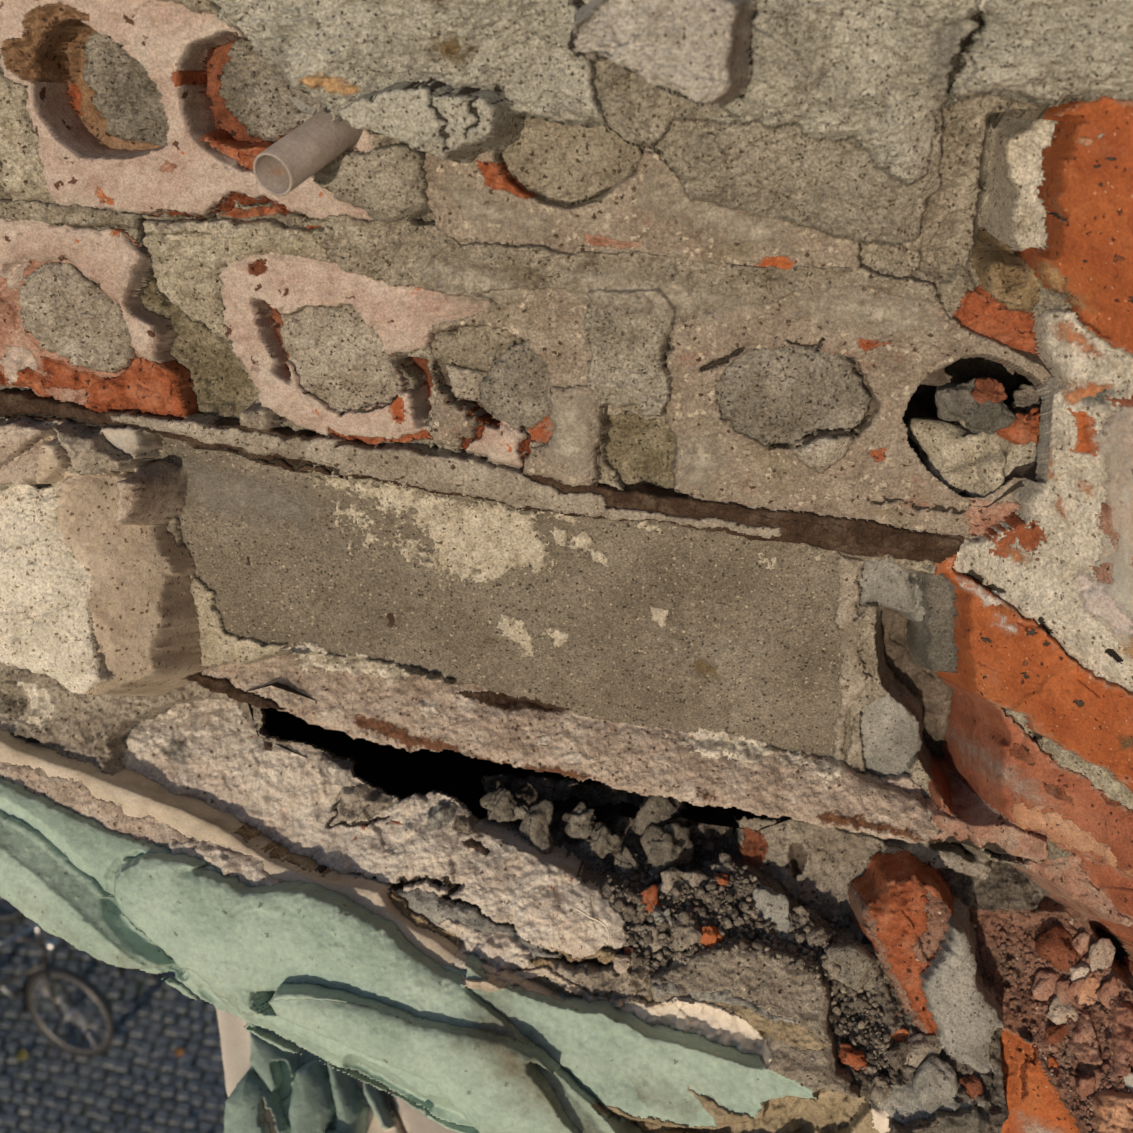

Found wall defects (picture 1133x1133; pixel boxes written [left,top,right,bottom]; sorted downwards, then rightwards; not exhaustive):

crack [567,0,586,51]
spalling [0,3,95,116]
spalling [0,346,200,419]
crack [700,347,745,372]
crack [786,337,825,351]
crack [770,415,870,450]
spalling [1067,408,1100,457]
crack [871,498,966,514]
spalling [983,512,1046,559]
spalling [244,682,601,819]
spalling [660,801,792,869]
spalling [460,936,890,1133]